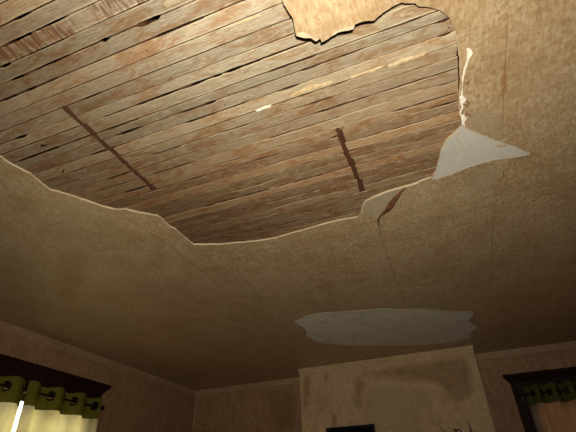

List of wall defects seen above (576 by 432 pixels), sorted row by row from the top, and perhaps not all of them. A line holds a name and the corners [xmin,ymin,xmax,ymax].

spalling [0,0,531,245]
peeling [294,308,480,346]